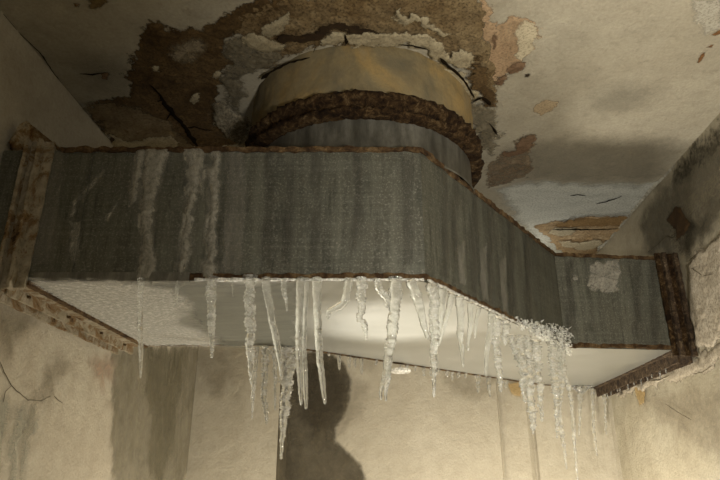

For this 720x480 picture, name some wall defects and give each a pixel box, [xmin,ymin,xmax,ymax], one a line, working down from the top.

crack [149,84,211,146]
flaking render [85,0,542,188]
damp [641,130,720,254]
peeling [534,216,628,254]
corrosion [26,281,148,348]
crack [0,362,62,403]
damp [111,346,199,480]